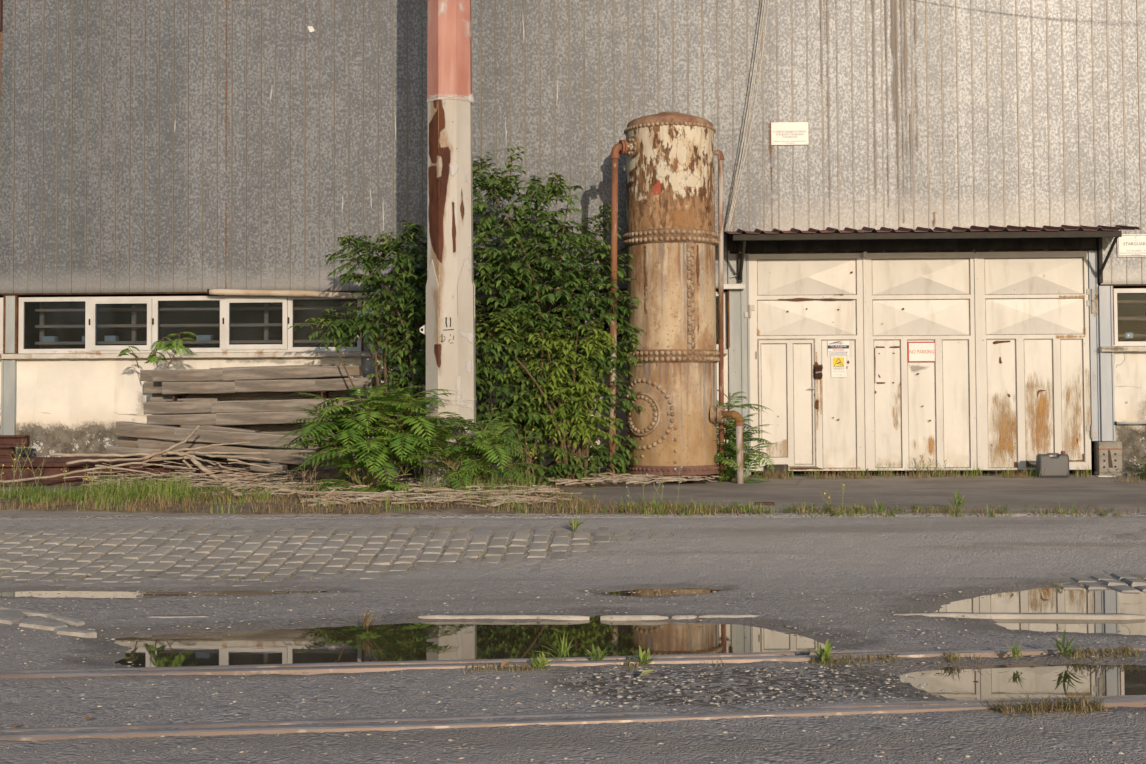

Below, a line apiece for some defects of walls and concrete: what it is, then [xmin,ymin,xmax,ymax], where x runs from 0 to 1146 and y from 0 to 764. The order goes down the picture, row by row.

rust [428,99,464,367]
rust [680,244,704,285]
water stain [16,422,120,457]
rust [990,383,1050,467]
rust [1065,387,1090,461]